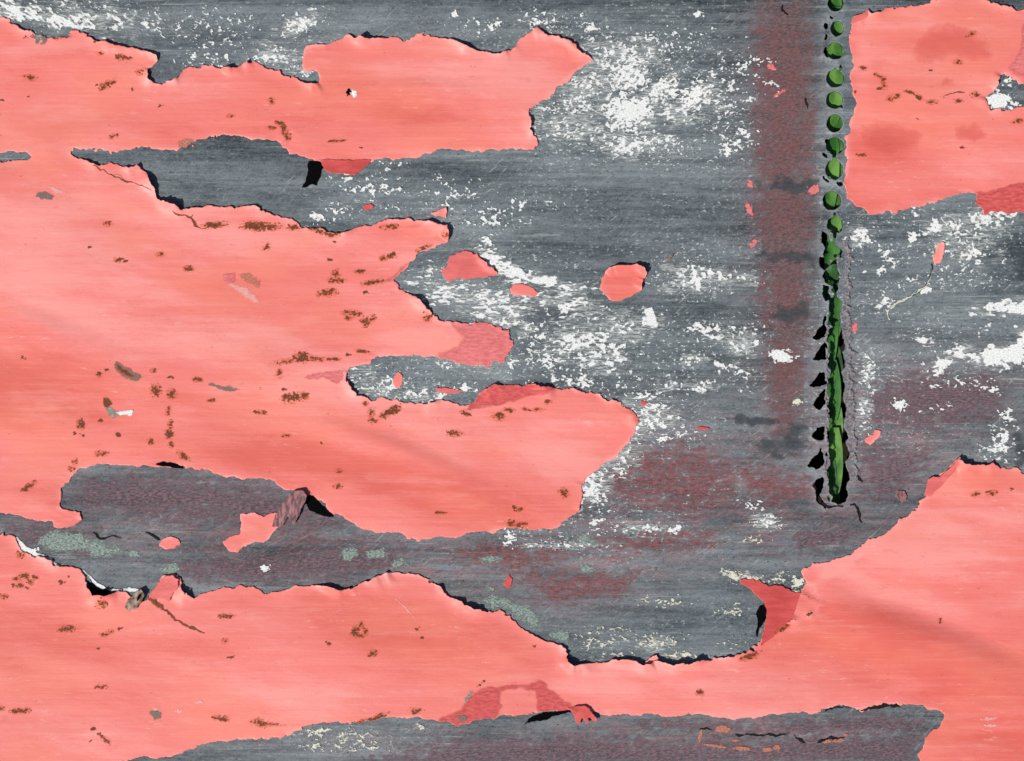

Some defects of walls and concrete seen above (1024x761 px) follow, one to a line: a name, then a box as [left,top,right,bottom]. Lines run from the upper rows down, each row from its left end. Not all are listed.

peeling [844,0,1024,215]
peeling [0,17,648,542]
corrosion [317,258,384,298]
peeling [933,241,945,265]
corrosion [343,310,376,328]
corrosion [275,350,369,402]
corrosion [148,369,190,460]
corrosion [363,402,401,423]
peeling [223,512,278,552]
peeling [801,459,1024,656]
crack [146,597,205,634]
peeling [0,533,1024,761]